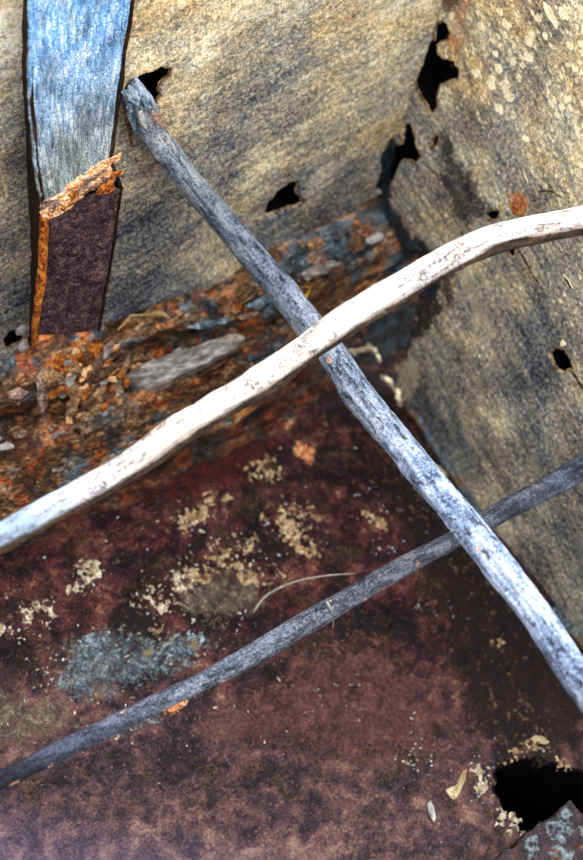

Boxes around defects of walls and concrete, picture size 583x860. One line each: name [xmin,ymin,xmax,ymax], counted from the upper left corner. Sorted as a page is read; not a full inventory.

rust [442,0,470,58]
spalling [137,67,168,100]
spalling [265,181,300,213]
rust [0,76,583,555]
spalling [552,340,572,371]
rust [0,343,583,791]
spalling [469,740,583,837]